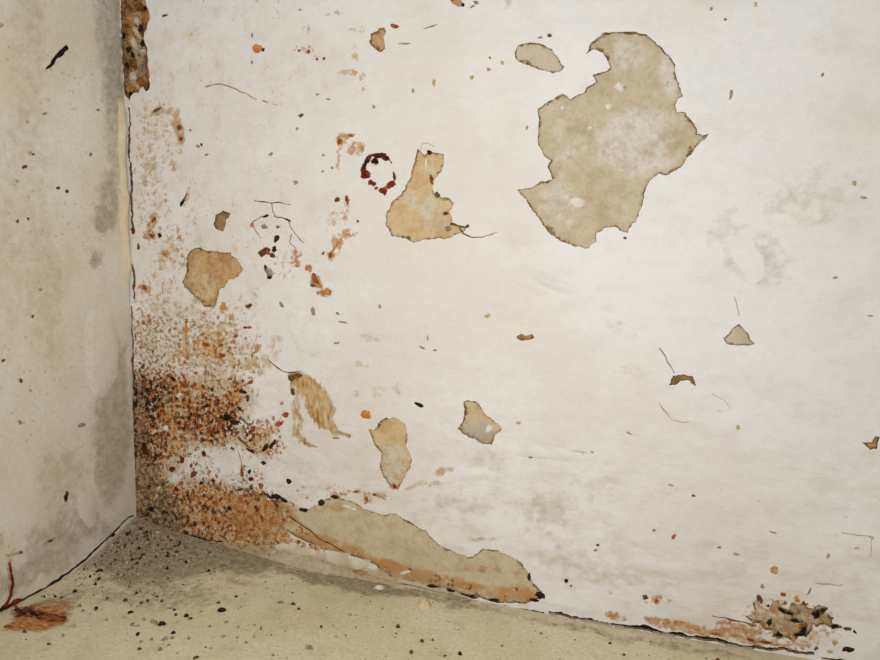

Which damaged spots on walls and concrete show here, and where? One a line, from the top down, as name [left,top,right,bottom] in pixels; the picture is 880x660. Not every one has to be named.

flaking render [121,0,150,100]
rust [336,134,396,196]
peeling [386,143,497,243]
peeling [515,32,708,249]
peeling [182,247,243,308]
rust [130,104,368,576]
peeling [723,324,754,346]
peeling [368,417,412,489]
peeling [458,400,501,444]
peeling [268,493,545,604]
rust [644,617,776,647]
flaking render [712,583,857,653]